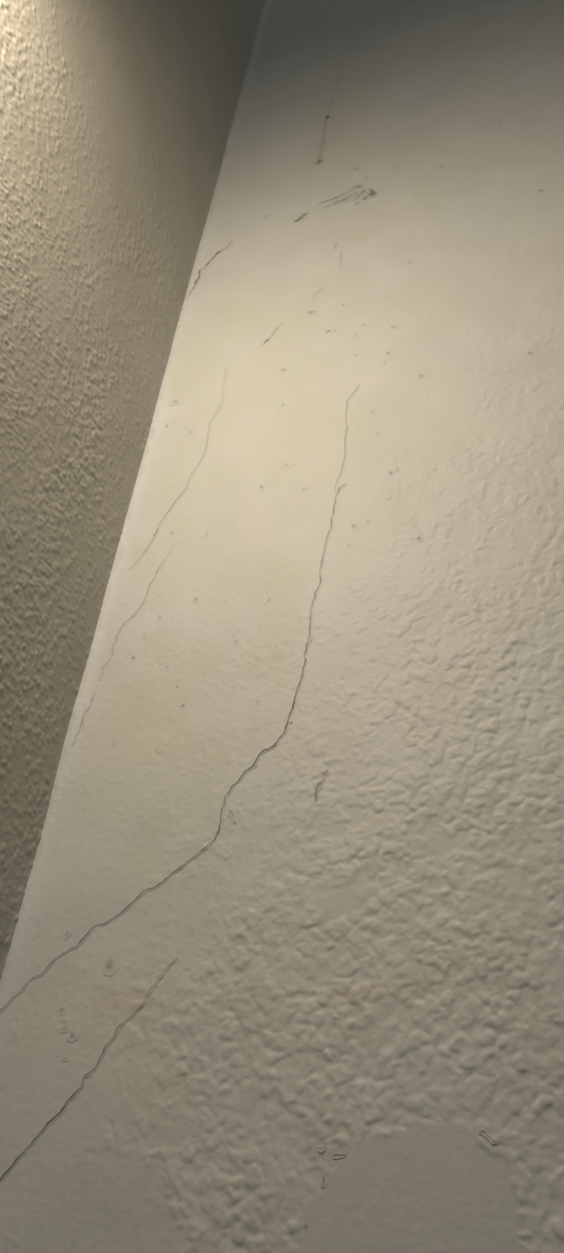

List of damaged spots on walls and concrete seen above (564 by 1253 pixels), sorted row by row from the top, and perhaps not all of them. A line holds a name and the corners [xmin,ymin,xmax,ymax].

crack [0,368,359,1014]
crack [0,956,178,1183]